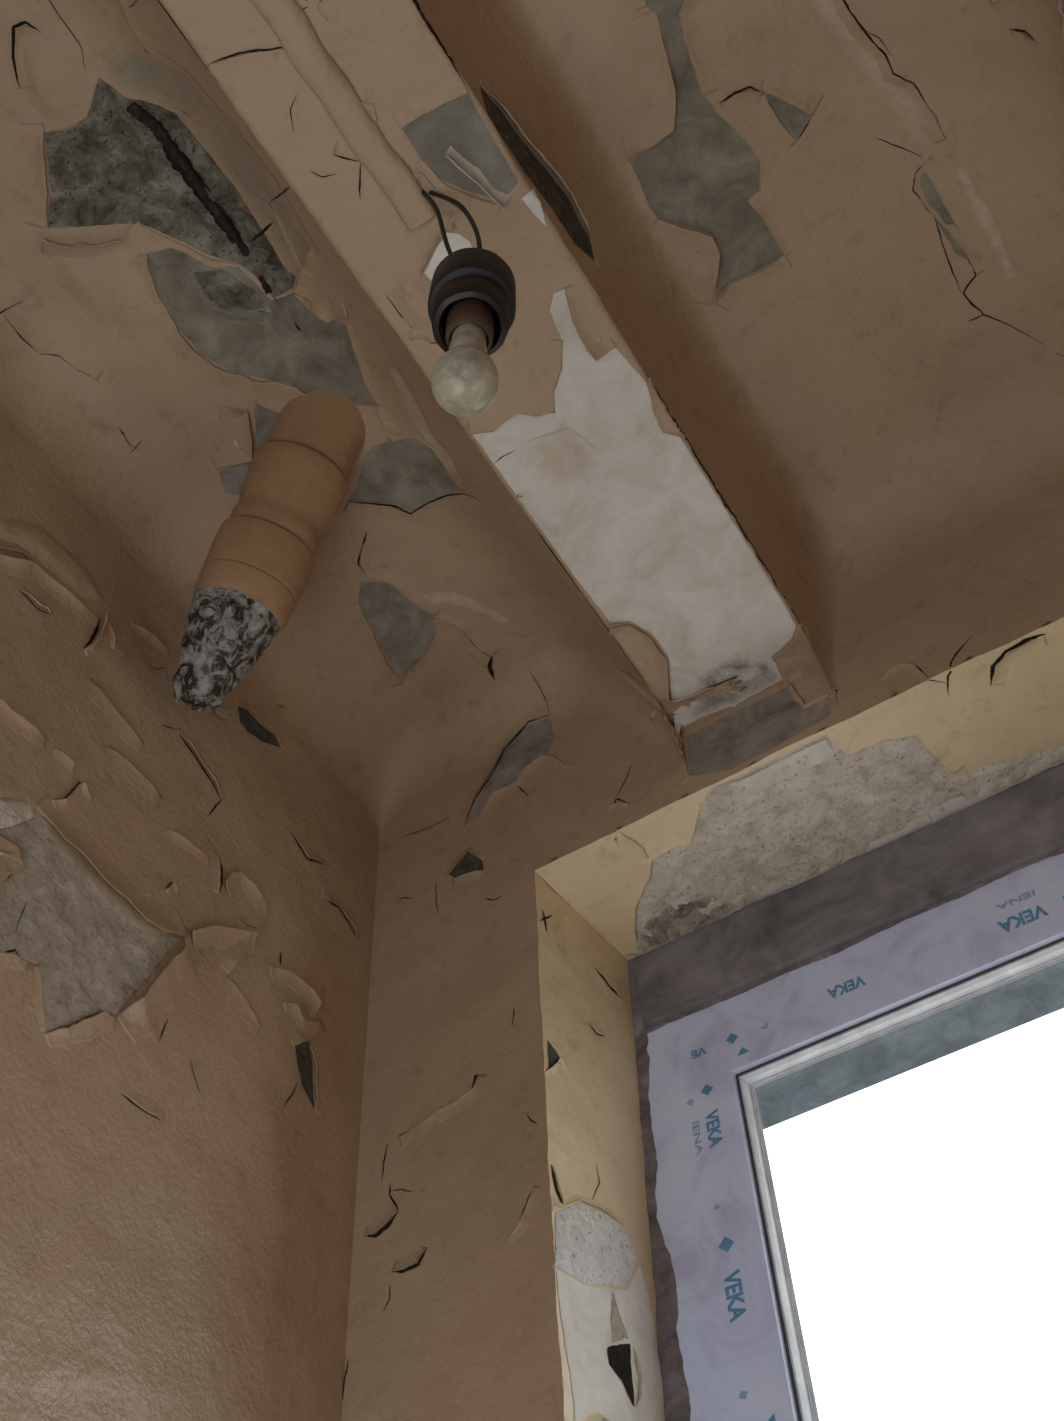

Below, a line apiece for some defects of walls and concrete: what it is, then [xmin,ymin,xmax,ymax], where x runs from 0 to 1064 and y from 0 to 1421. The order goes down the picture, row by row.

spalling [14,78,382,494]
peeling [404,216,472,281]
peeling [393,79,600,266]
peeling [620,0,825,312]
crack [832,0,1063,356]
peeling [343,431,479,523]
peeling [466,284,1064,956]
crack [879,634,1048,694]
peeling [0,793,259,1049]
peeling [552,1194,665,1421]